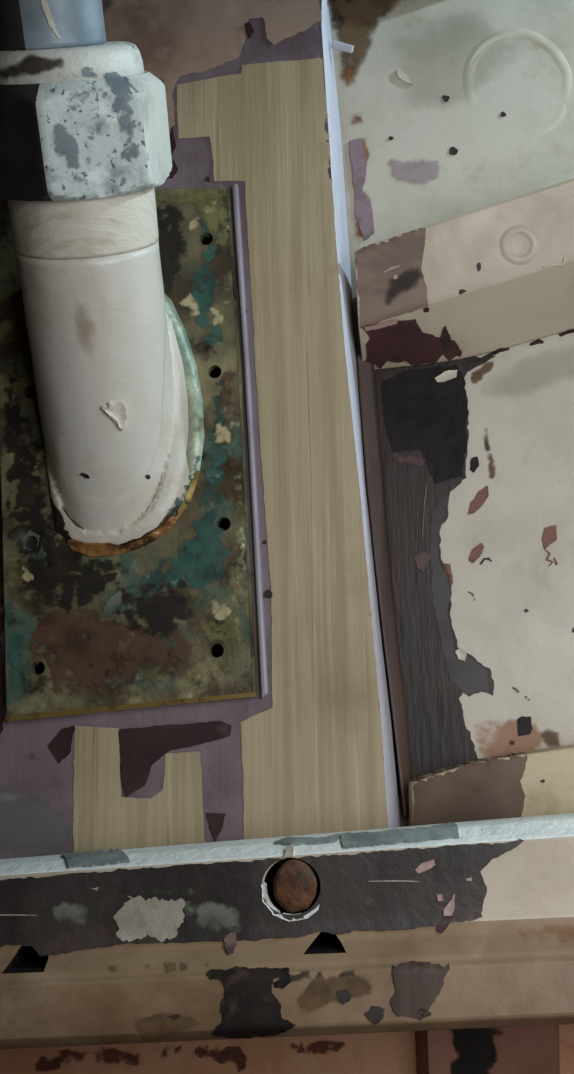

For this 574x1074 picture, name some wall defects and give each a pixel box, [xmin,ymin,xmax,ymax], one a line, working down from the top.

peeling [0,58,524,956]
peeling [207,966,296,1039]
peeling [337,989,351,1004]
peeling [366,961,450,1024]
corrosion [36,1048,139,1071]
corrosion [195,1046,247,1072]
corrosion [292,1041,345,1054]
leakage [451,1028,502,1074]